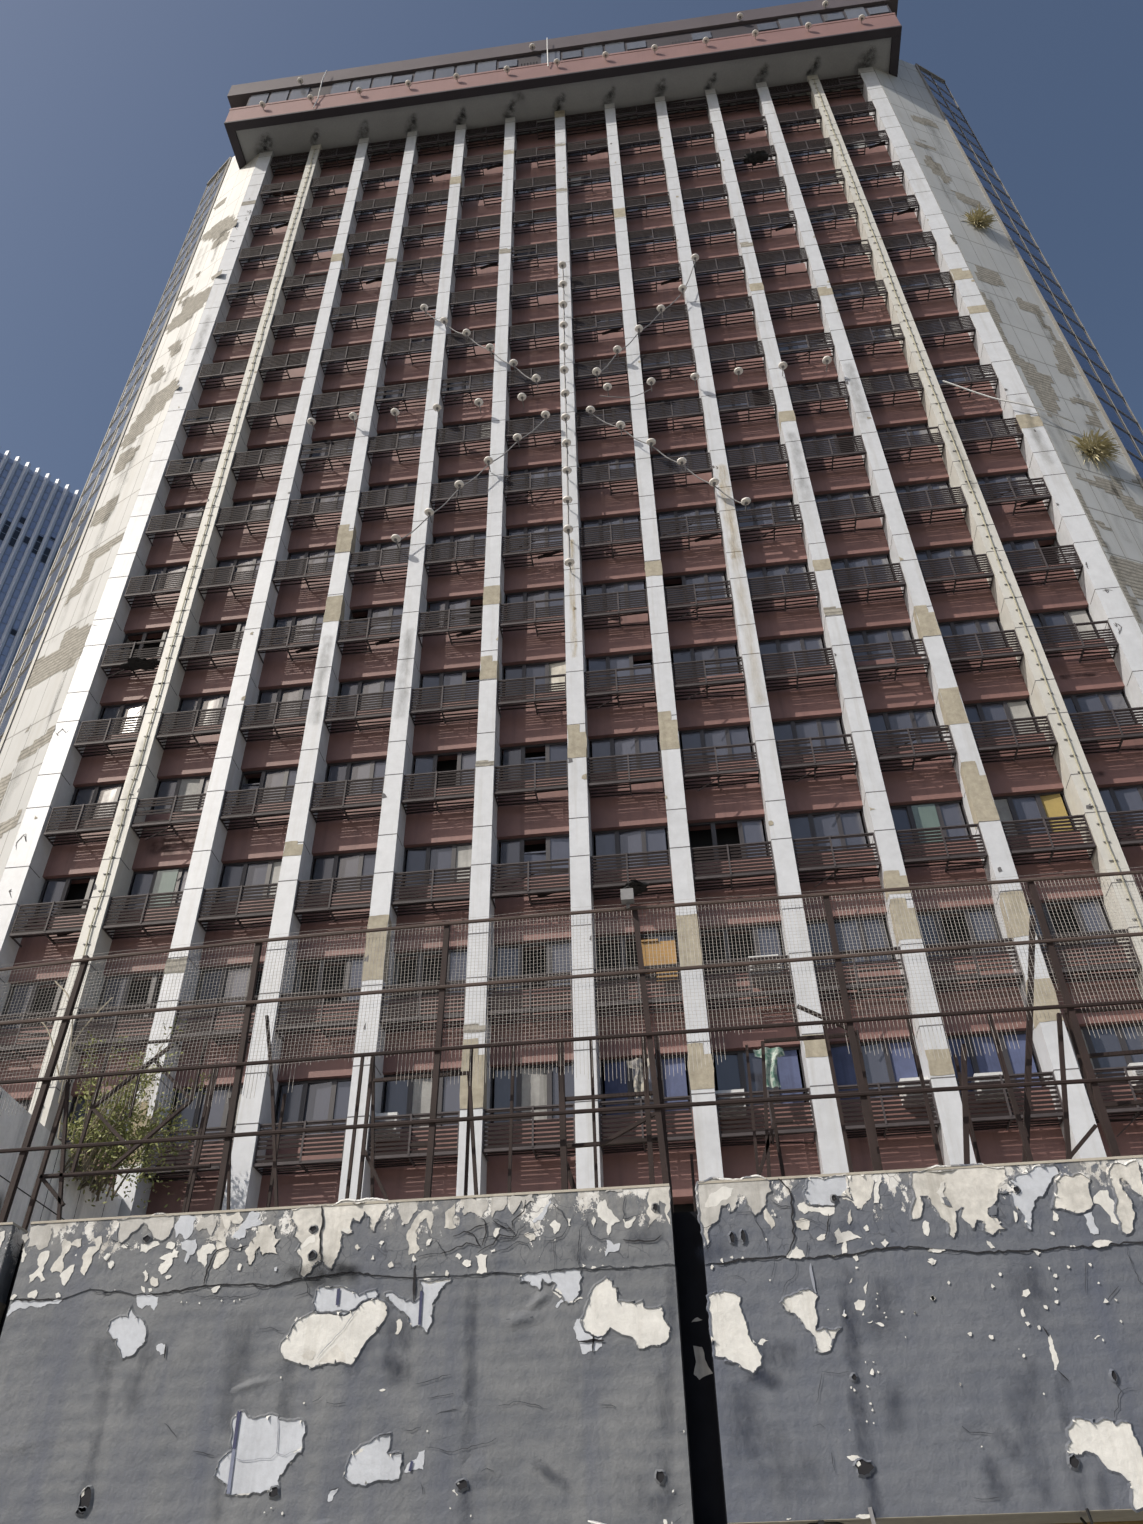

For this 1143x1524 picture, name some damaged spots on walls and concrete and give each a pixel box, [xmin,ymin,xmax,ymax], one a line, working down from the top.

peeling [0,1194,571,1379]
crack [14,1194,675,1331]
peeling [518,1186,672,1354]
peeling [692,1289,768,1380]
peeling [695,1175,776,1269]
peeling [779,1174,916,1355]
crack [702,1178,1143,1299]
peeling [909,1159,1143,1303]
peeling [213,1402,308,1515]
peeling [327,1431,425,1502]
crack [406,1374,545,1471]
peeling [1065,1416,1143,1513]